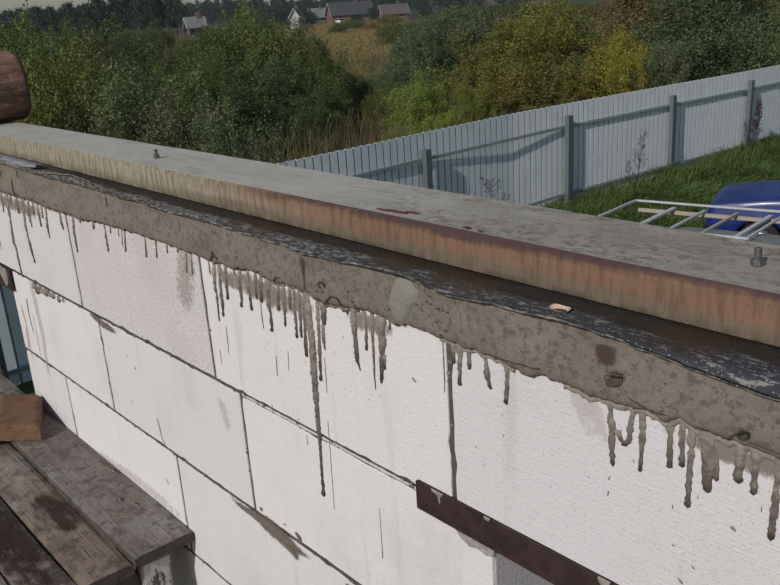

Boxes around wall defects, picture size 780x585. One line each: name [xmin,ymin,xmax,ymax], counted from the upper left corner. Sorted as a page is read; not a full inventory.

leakage [0,171,50,277]
leakage [58,211,81,252]
leakage [92,222,127,252]
leakage [144,236,193,275]
leakage [208,259,327,497]
leakage [346,307,391,390]
leakage [442,341,492,393]
leakage [601,394,647,472]
leakage [662,420,780,541]